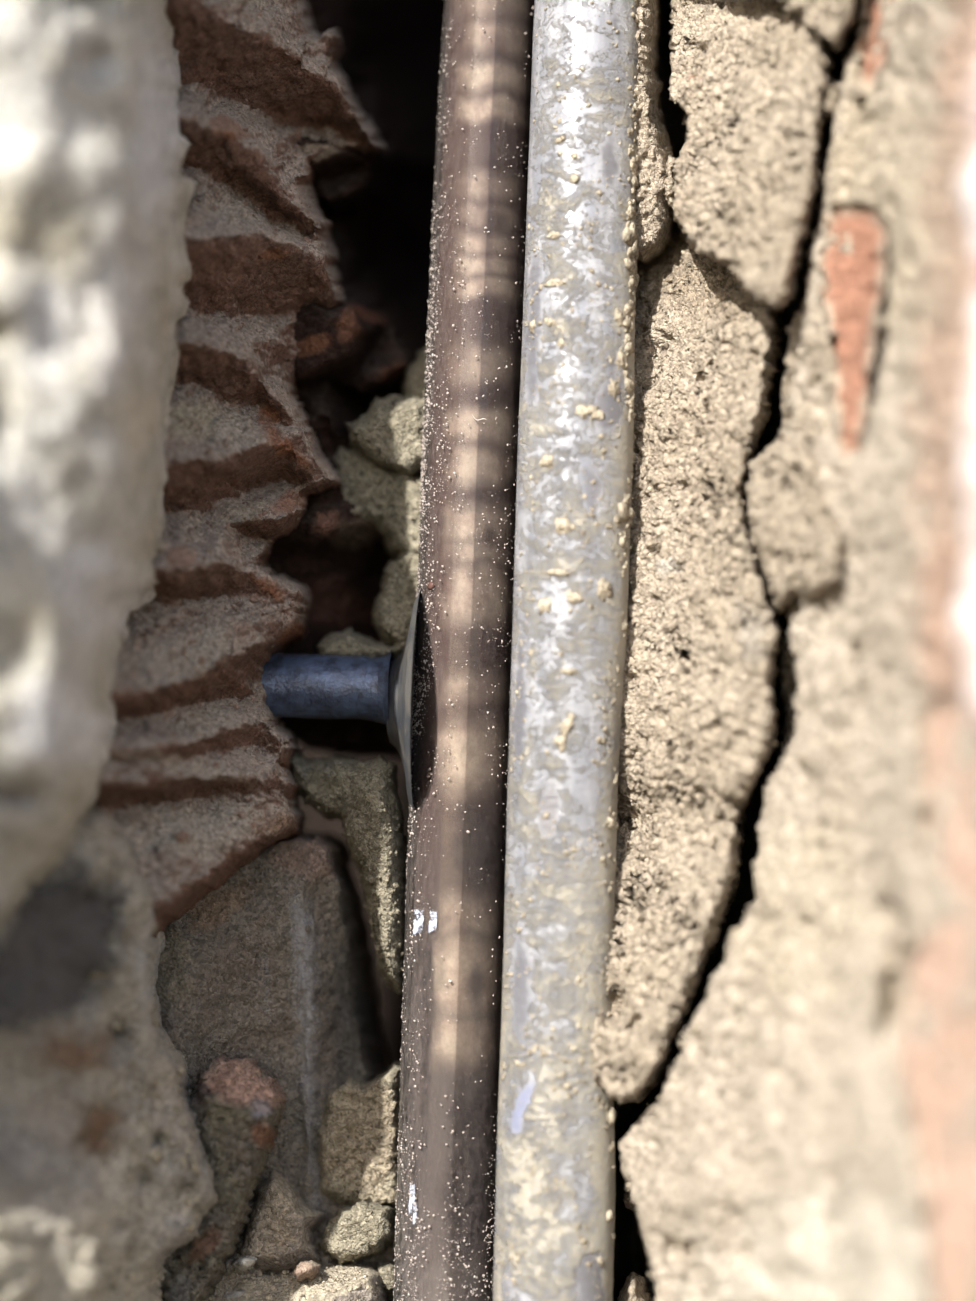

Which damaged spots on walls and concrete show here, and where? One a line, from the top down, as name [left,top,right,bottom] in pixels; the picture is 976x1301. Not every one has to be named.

crack [657,0,688,158]
crack [827,34,857,82]
crack [758,123,833,454]
crack [779,613,790,631]
crack [613,681,785,1301]